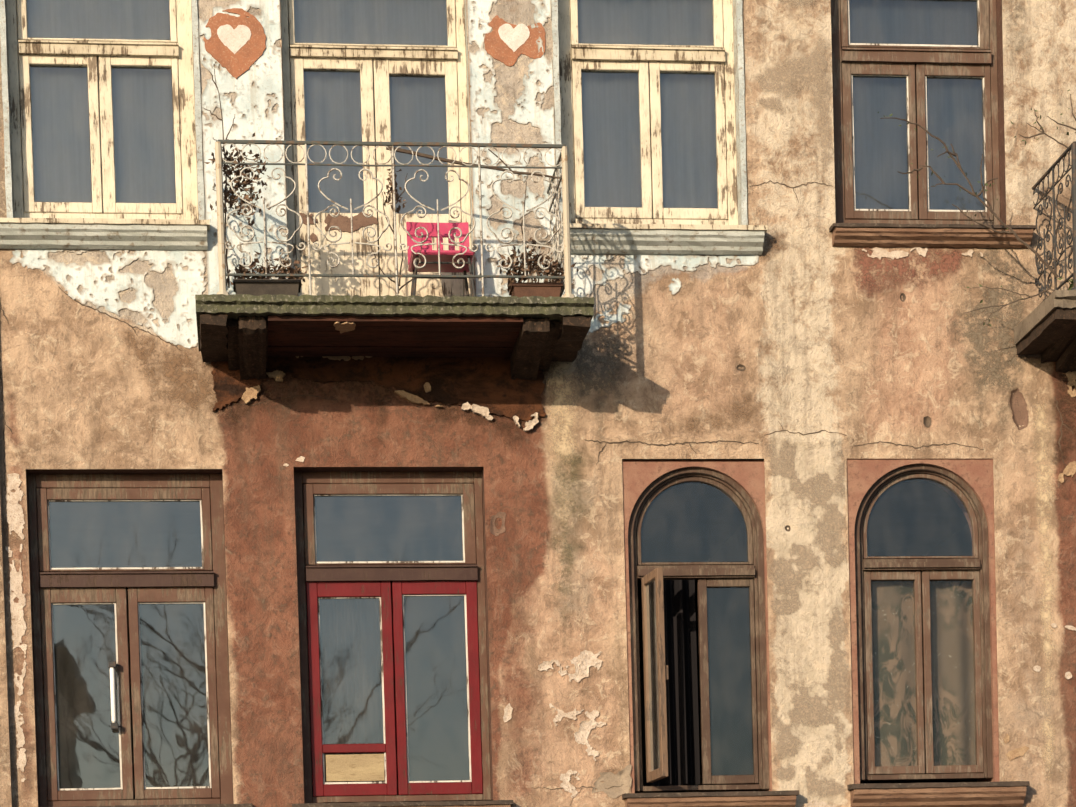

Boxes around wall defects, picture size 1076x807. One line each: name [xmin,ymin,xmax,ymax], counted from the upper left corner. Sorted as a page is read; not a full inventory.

peeling [10,0,378,349]
peeling [467,0,759,297]
crack [749,180,830,202]
crack [0,302,13,491]
flaking render [241,370,285,404]
flaking render [461,402,493,421]
flaking render [513,412,539,432]
crack [585,421,981,463]
peeling [767,444,846,615]
peeling [5,473,28,782]
flaking render [549,703,632,799]
peeling [773,608,850,807]